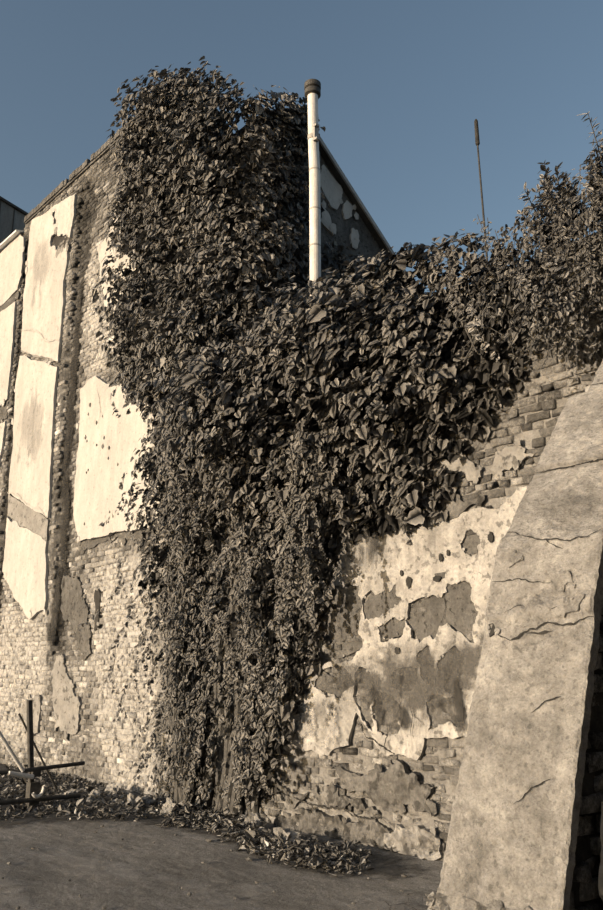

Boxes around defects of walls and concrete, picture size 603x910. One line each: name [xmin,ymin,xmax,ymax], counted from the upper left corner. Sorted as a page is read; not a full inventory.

flaking render [320,164,360,249]
flaking render [97,213,143,310]
flaking render [0,194,77,620]
flaking render [73,376,162,554]
flaking render [422,438,536,485]
flaking render [60,575,101,661]
flaking render [267,486,585,817]
crack [492,576,544,584]
crack [499,606,593,640]
crack [514,529,601,549]
flaking render [19,653,82,741]
spalling [425,892,532,910]